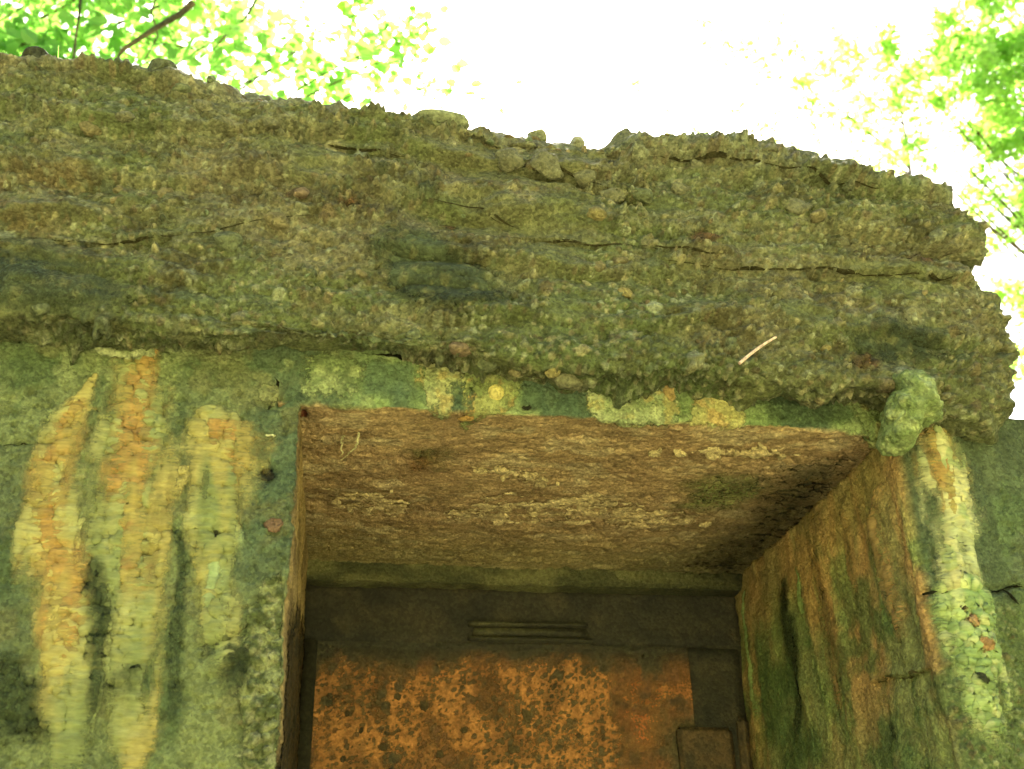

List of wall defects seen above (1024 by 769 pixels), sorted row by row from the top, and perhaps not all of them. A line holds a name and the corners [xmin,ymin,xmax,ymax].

crack [660,151,879,189]
crack [422,197,965,284]
damp [714,464,840,569]
damp [0,651,40,737]
damp [81,559,109,710]
damp [168,530,186,708]
damp [221,645,249,688]
rust [311,656,693,769]
damp [779,567,804,734]
efflorescence [931,571,1013,739]